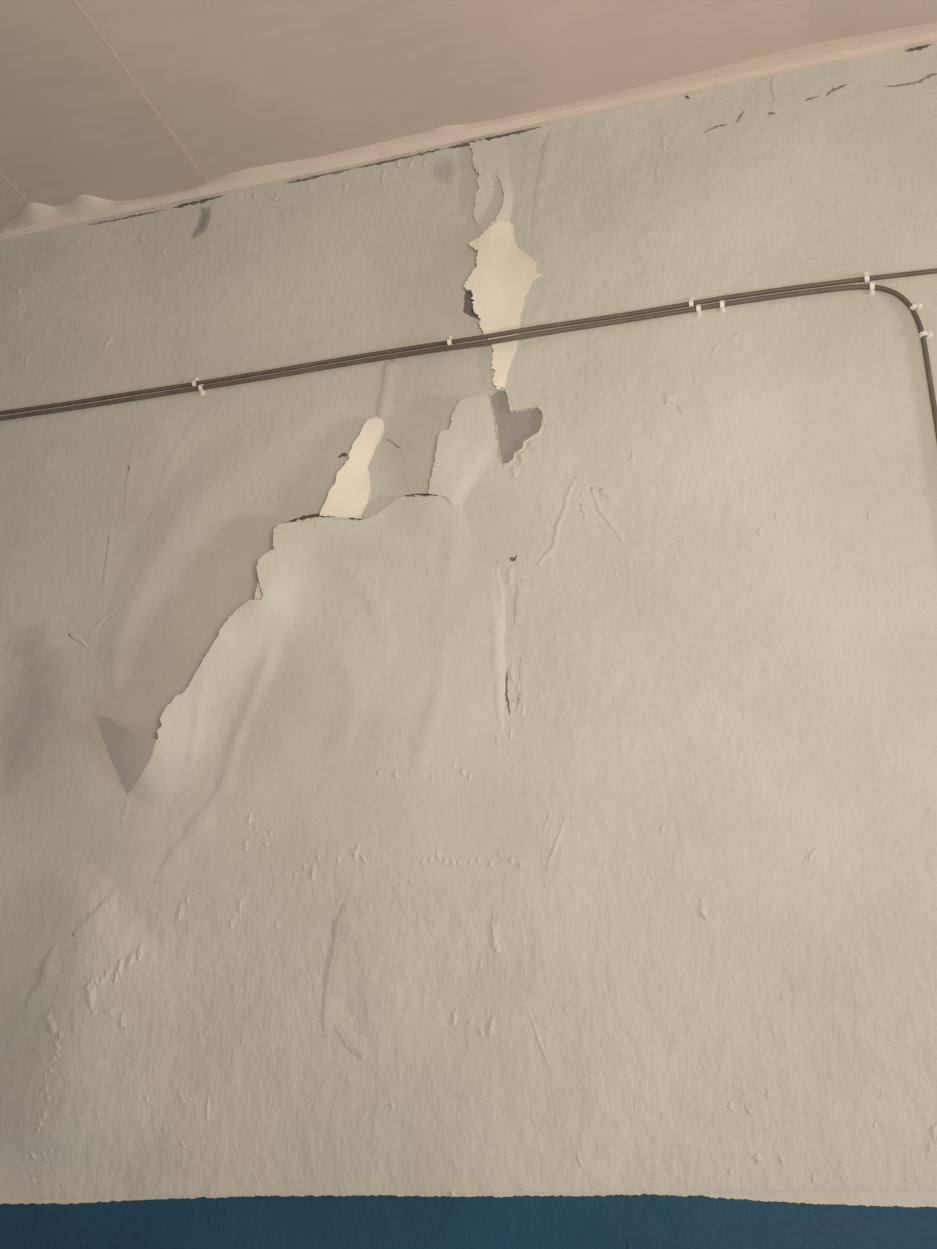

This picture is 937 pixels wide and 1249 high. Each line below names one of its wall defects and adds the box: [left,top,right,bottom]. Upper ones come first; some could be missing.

peeling [94,137,548,883]